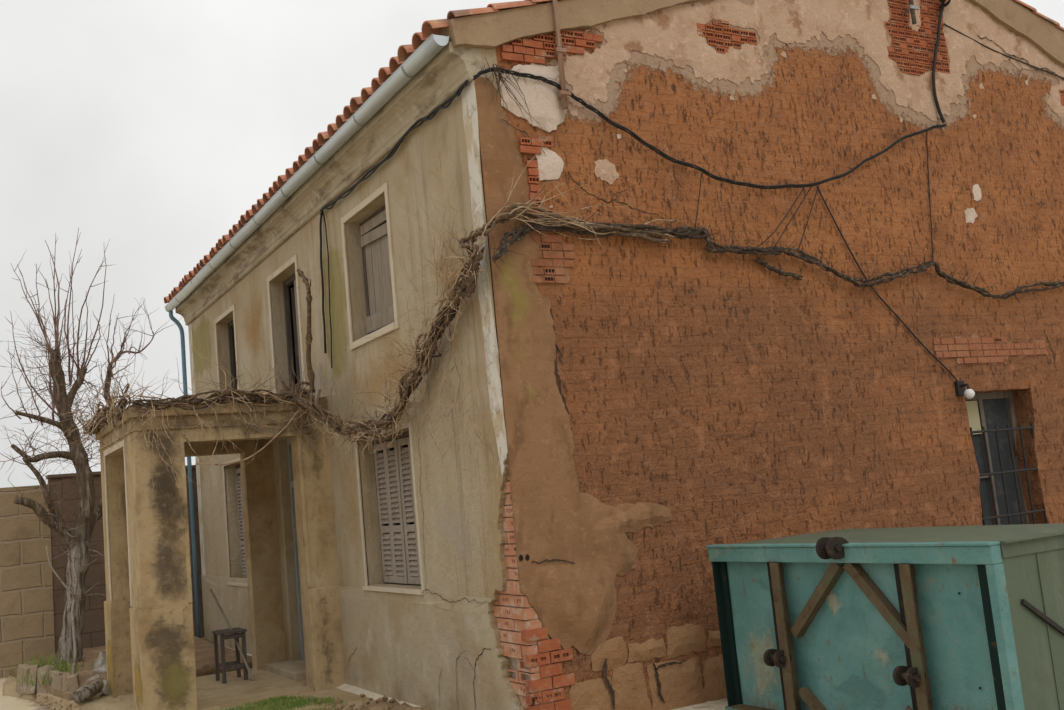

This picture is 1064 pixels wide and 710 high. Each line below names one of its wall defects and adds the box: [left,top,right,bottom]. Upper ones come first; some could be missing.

flaking render [499,0,1064,284]
flaking render [933,334,1048,365]
damp [147,433,186,593]
damp [149,626,186,703]
crack [439,648,491,706]
spalling [493,462,575,710]